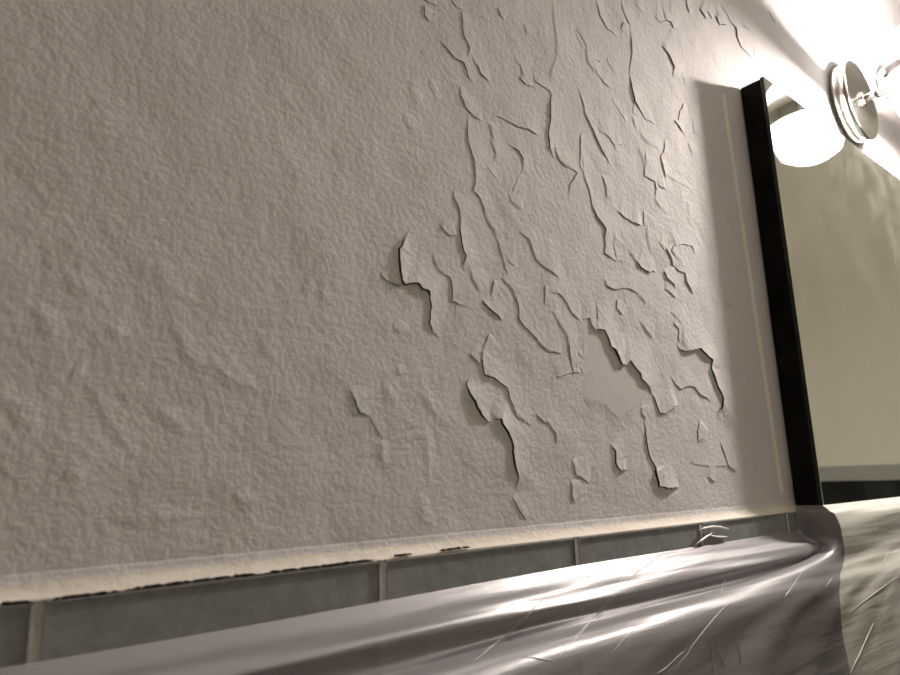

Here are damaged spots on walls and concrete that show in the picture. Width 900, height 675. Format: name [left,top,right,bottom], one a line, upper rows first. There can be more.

peeling [713,0,760,64]
peeling [380,232,448,338]
flaking render [439,0,739,432]
peeling [466,340,537,520]